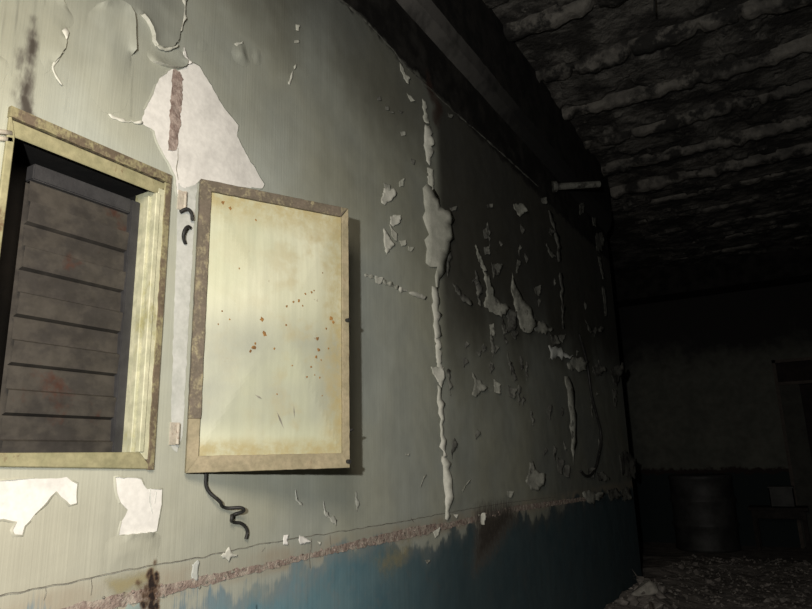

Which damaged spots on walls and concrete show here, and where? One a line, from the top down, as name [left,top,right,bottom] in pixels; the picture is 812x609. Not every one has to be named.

spalling [62,47,625,609]
peeling [0,477,79,537]
corrosion [111,560,160,609]
crack [0,497,552,599]